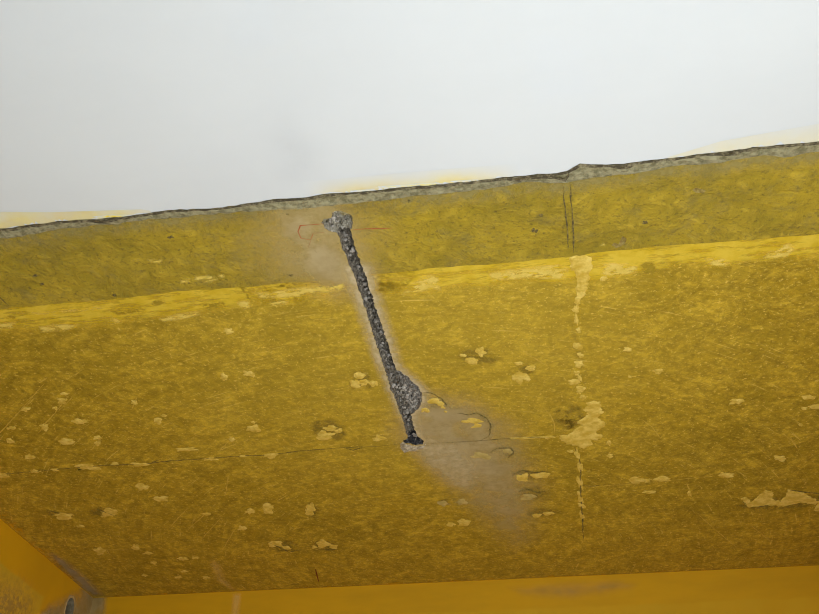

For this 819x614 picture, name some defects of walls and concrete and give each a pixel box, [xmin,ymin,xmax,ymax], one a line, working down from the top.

crack [0,142,819,251]
spalling [0,141,819,256]
peeling [569,255,608,333]
peeling [315,420,345,440]
peeling [349,372,378,389]
water stain [273,206,523,529]
spalling [356,264,447,453]
peeling [459,347,494,365]
peeling [512,361,535,385]
peeling [556,343,613,458]
peeling [801,395,819,410]
peeling [741,489,819,511]